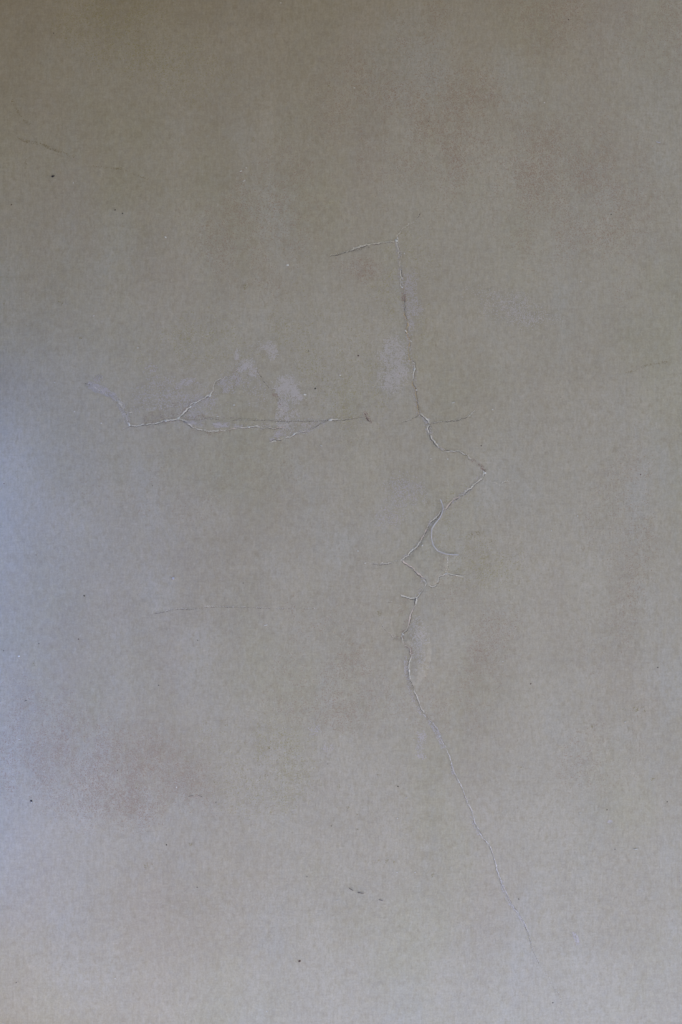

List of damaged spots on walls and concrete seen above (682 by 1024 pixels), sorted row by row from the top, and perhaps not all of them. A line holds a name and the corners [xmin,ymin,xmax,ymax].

crack [85,366,372,442]
crack [330,214,562,1011]